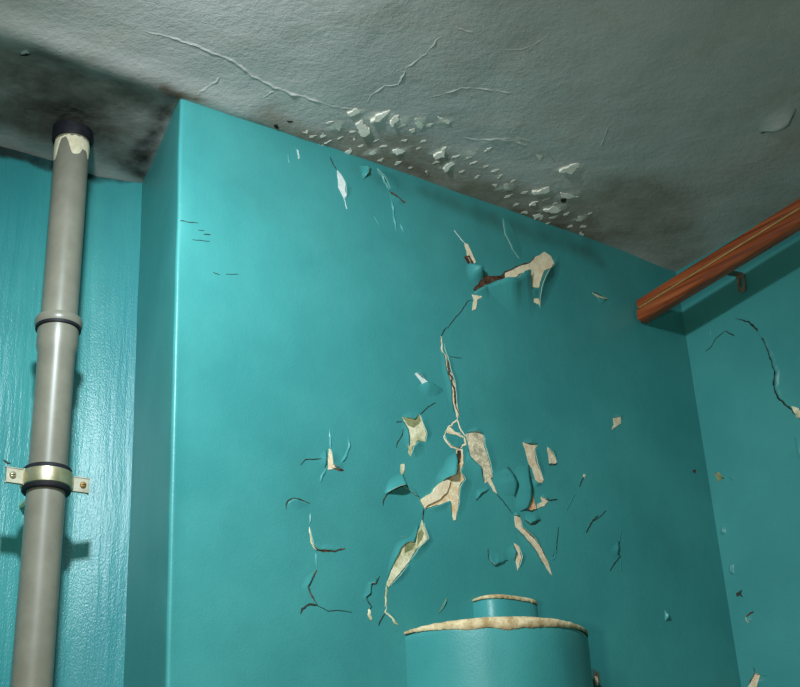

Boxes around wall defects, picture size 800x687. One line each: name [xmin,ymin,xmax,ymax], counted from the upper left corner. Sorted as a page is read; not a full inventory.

damp [0,146,53,168]
damp [0,52,146,155]
crack [138,27,475,110]
peeling [302,108,454,169]
peeling [425,139,592,236]
peeling [448,230,561,327]
crack [301,427,351,483]
peeling [396,371,444,458]
crack [439,327,460,419]
peeling [383,419,558,587]
crack [706,319,800,419]
crack [286,498,398,625]